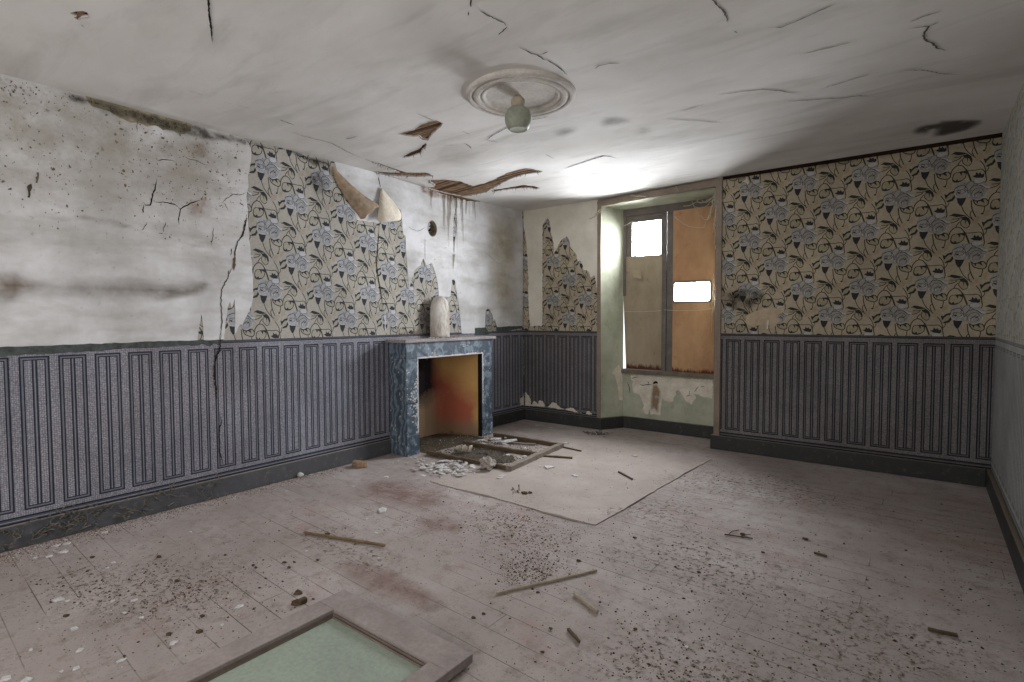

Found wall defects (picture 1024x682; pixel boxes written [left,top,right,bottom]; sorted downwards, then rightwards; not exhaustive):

crack [205,0,213,38]
crack [904,12,946,74]
spalling [73,96,226,138]
leakage [916,121,977,135]
leakage [0,116,102,229]
leakage [73,107,248,219]
leakage [423,190,475,215]
crack [142,155,247,463]
peeling [520,392,592,415]
peeling [612,365,713,415]